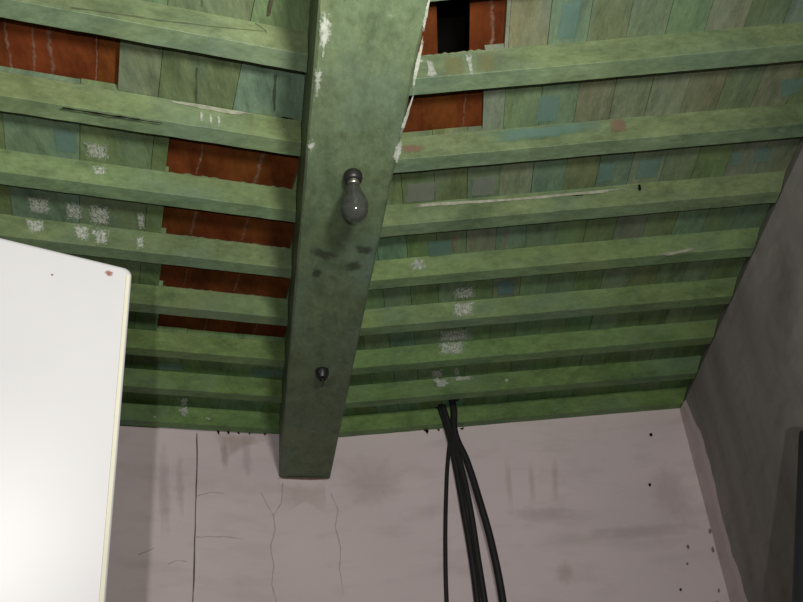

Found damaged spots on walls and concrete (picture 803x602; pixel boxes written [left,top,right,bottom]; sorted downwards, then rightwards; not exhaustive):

peeling [0,17,120,91]
peeling [413,0,506,85]
peeling [393,89,483,162]
peeling [165,137,299,190]
peeling [161,205,294,249]
peeling [159,264,290,299]
peeling [157,314,286,342]